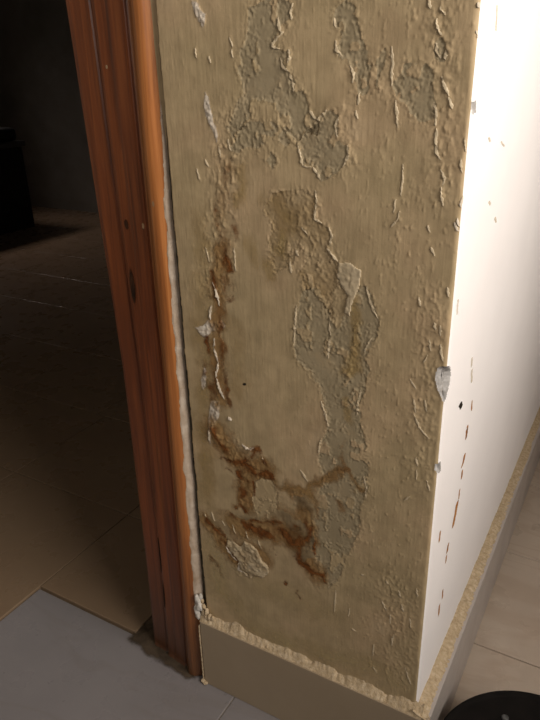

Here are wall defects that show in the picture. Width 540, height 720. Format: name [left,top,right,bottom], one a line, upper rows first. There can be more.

peeling [218,0,349,182]
peeling [333,0,454,160]
corrosion [204,242,233,407]
peeling [213,339,224,398]
peeling [264,189,380,612]
flaking render [423,323,451,402]
flaking render [205,512,269,579]
peeling [252,478,278,519]
corrosion [199,417,365,583]